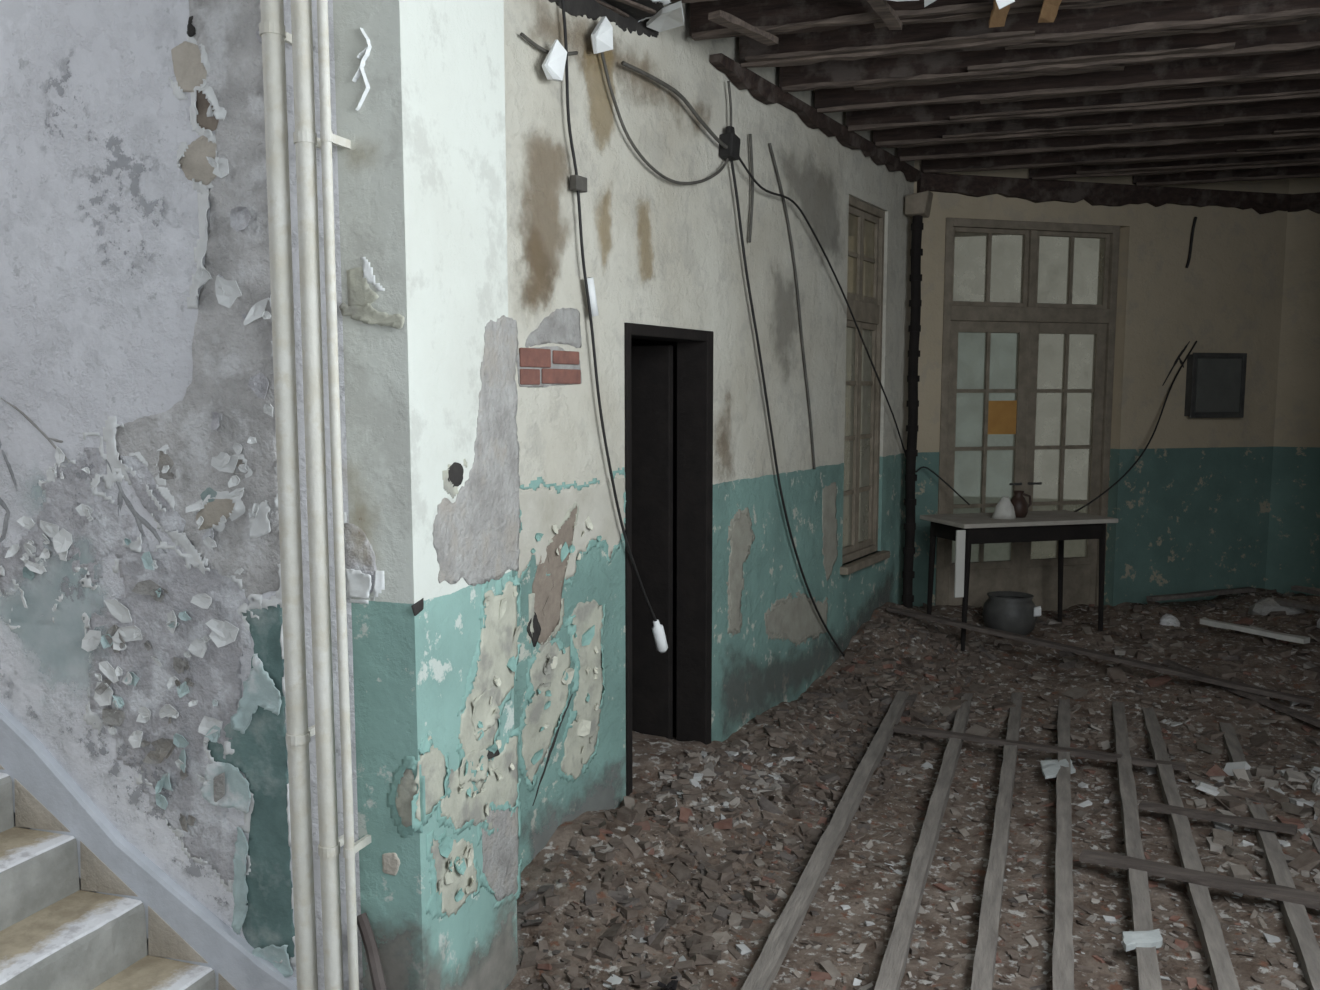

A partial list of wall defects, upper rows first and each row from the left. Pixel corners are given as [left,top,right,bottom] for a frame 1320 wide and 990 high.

peeling [542,39,567,81]
damp [548,20,660,92]
spalling [548,0,684,54]
damp [527,142,563,301]
peeling [0,0,296,977]
spalling [387,308,626,920]
peeling [726,507,755,635]
peeling [822,482,838,581]
peeling [382,853,400,876]